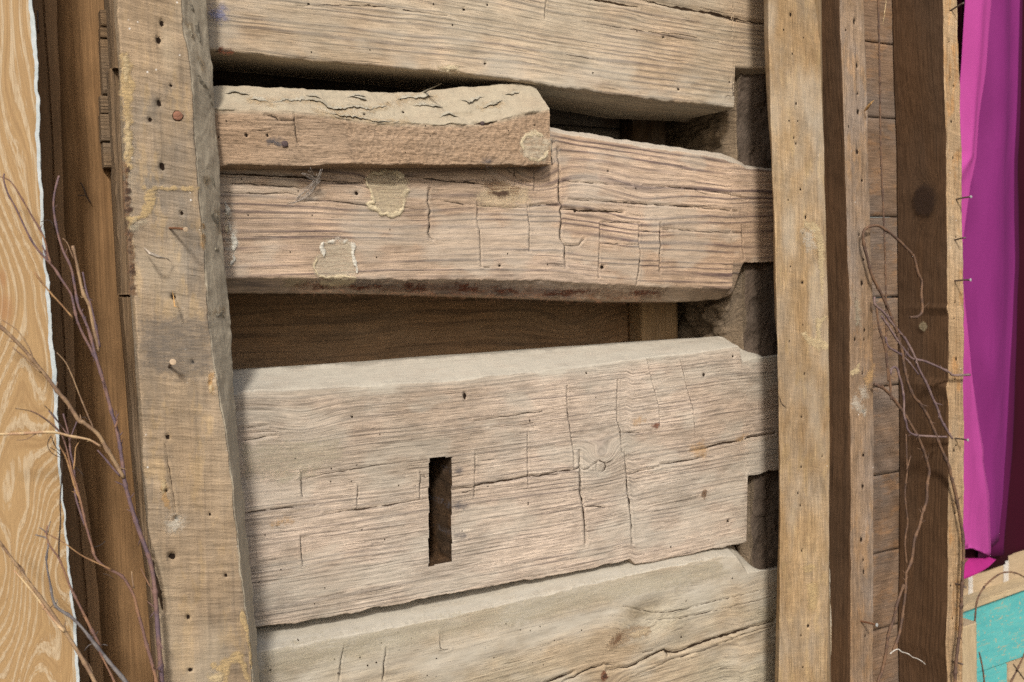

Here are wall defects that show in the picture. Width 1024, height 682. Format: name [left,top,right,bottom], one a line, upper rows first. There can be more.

crack [395,142,746,285]
crack [452,369,774,539]